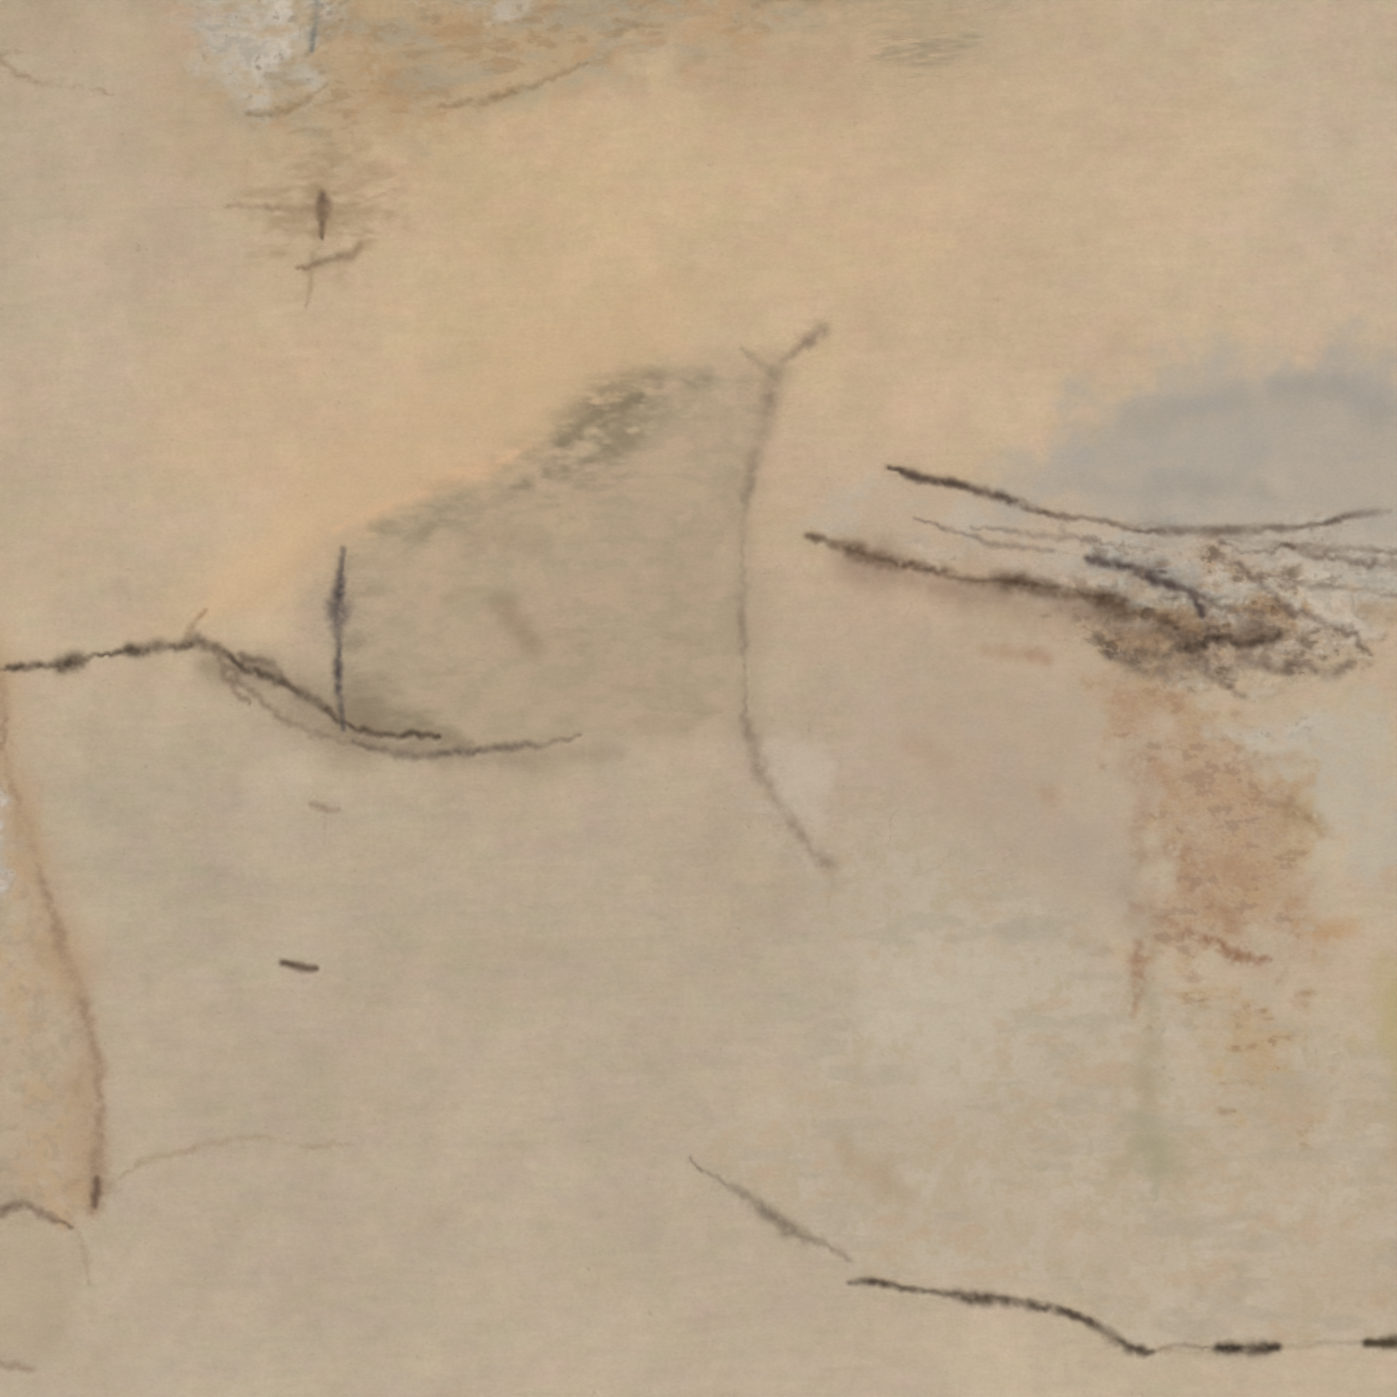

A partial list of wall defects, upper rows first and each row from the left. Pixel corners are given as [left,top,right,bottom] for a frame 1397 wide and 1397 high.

crack [713,310,844,909]
flaking render [779,425,1397,565]
crack [801,450,1397,704]
leakage [1023,309,1397,507]
flaking render [1185,650,1312,707]
flaking render [1150,539,1397,655]
crack [0,542,586,1289]
rust [1087,625,1366,1183]
crack [0,1341,38,1381]
crack [683,1153,1397,1372]